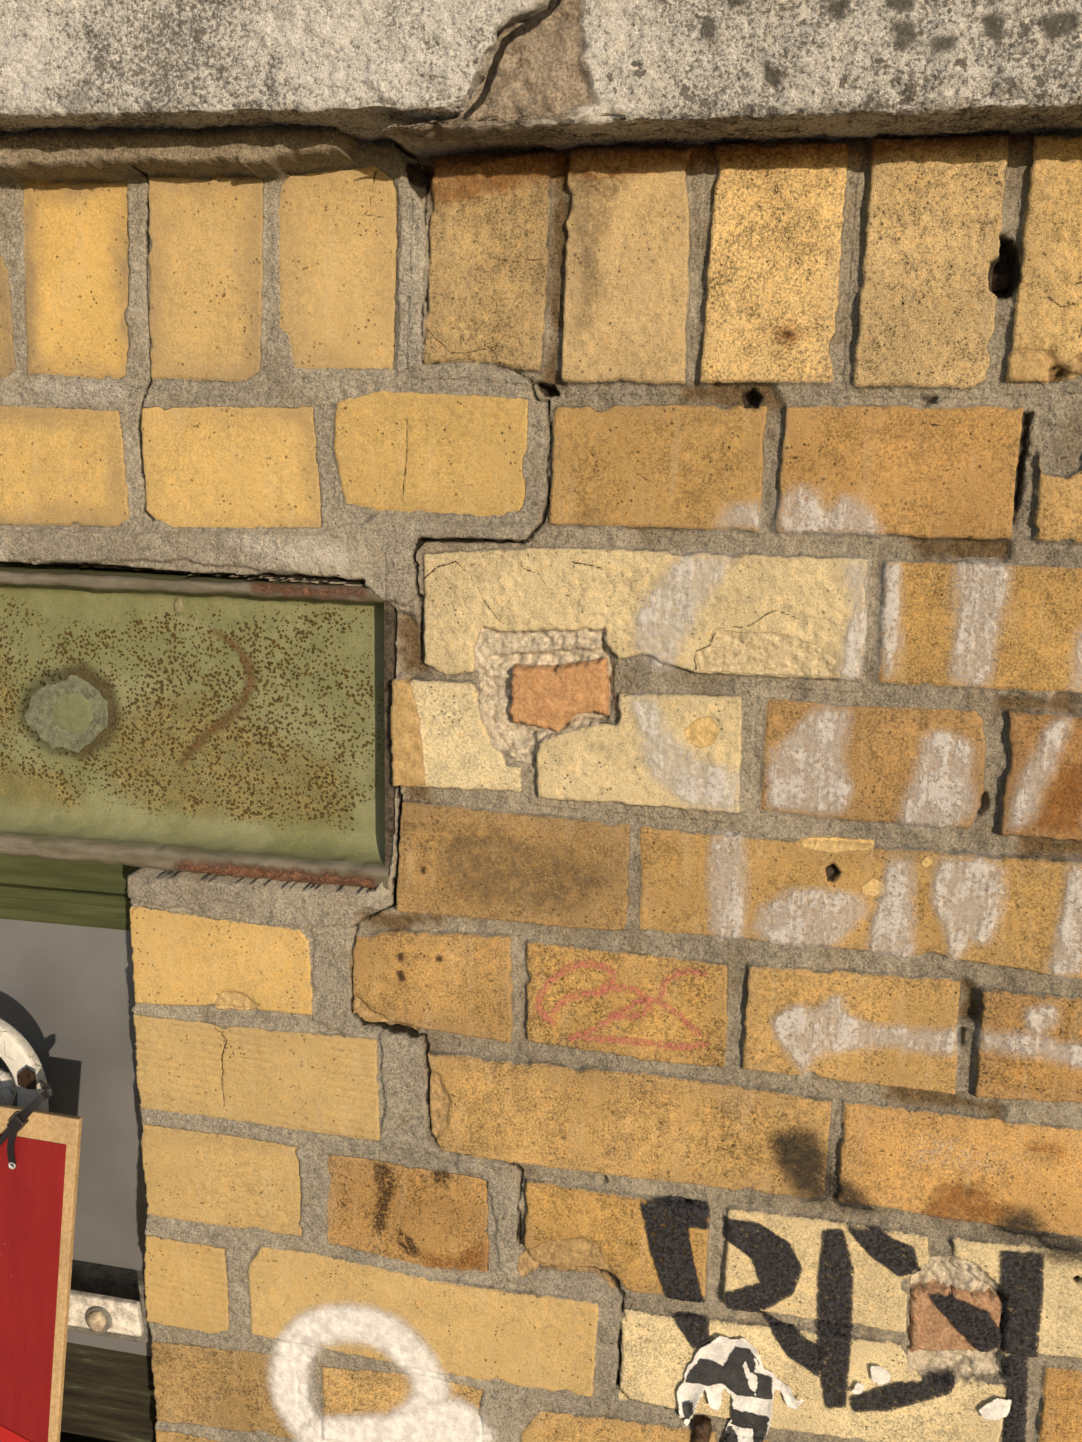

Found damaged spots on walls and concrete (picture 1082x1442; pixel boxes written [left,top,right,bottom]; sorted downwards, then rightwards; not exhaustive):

crack [463,0,562,120]
crack [413,298,645,658]
crack [47,563,365,585]
corrosion [0,582,384,833]
spalling [474,628,614,765]
spalling [696,630,836,678]
corrosion [175,861,376,889]
crack [351,786,468,1155]
crack [581,1266,668,1409]
peeling [852,1366,891,1394]
spalling [907,1256,1006,1384]
peeling [979,1398,1012,1420]